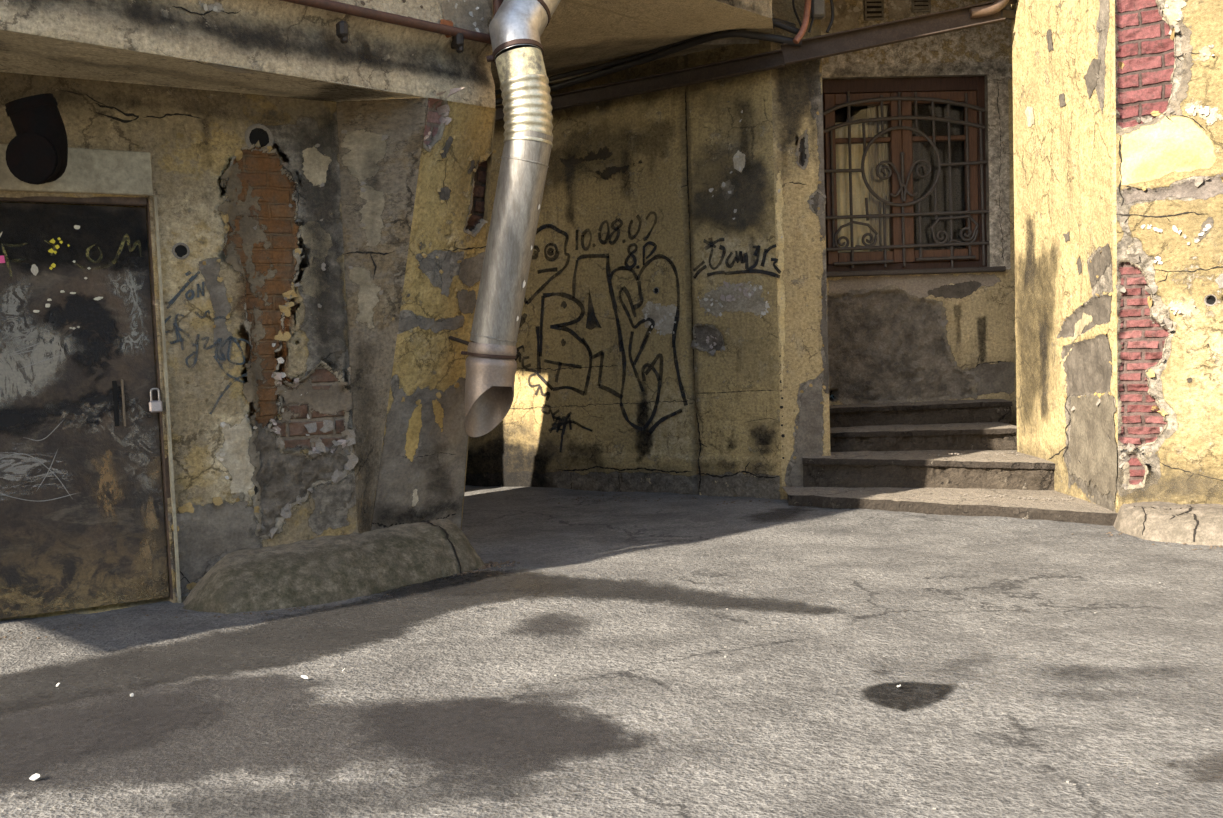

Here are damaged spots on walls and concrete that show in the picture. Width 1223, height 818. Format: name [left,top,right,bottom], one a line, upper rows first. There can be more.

spalling [1082,0,1223,136]
spalling [423,87,465,161]
peeling [391,252,485,333]
spalling [464,150,496,237]
crack [1118,135,1201,222]
peeling [1141,217,1214,245]
crack [1156,266,1223,283]
spalling [171,144,358,595]
spalling [789,280,1015,487]
spalling [1057,243,1200,502]
crack [1134,460,1223,542]